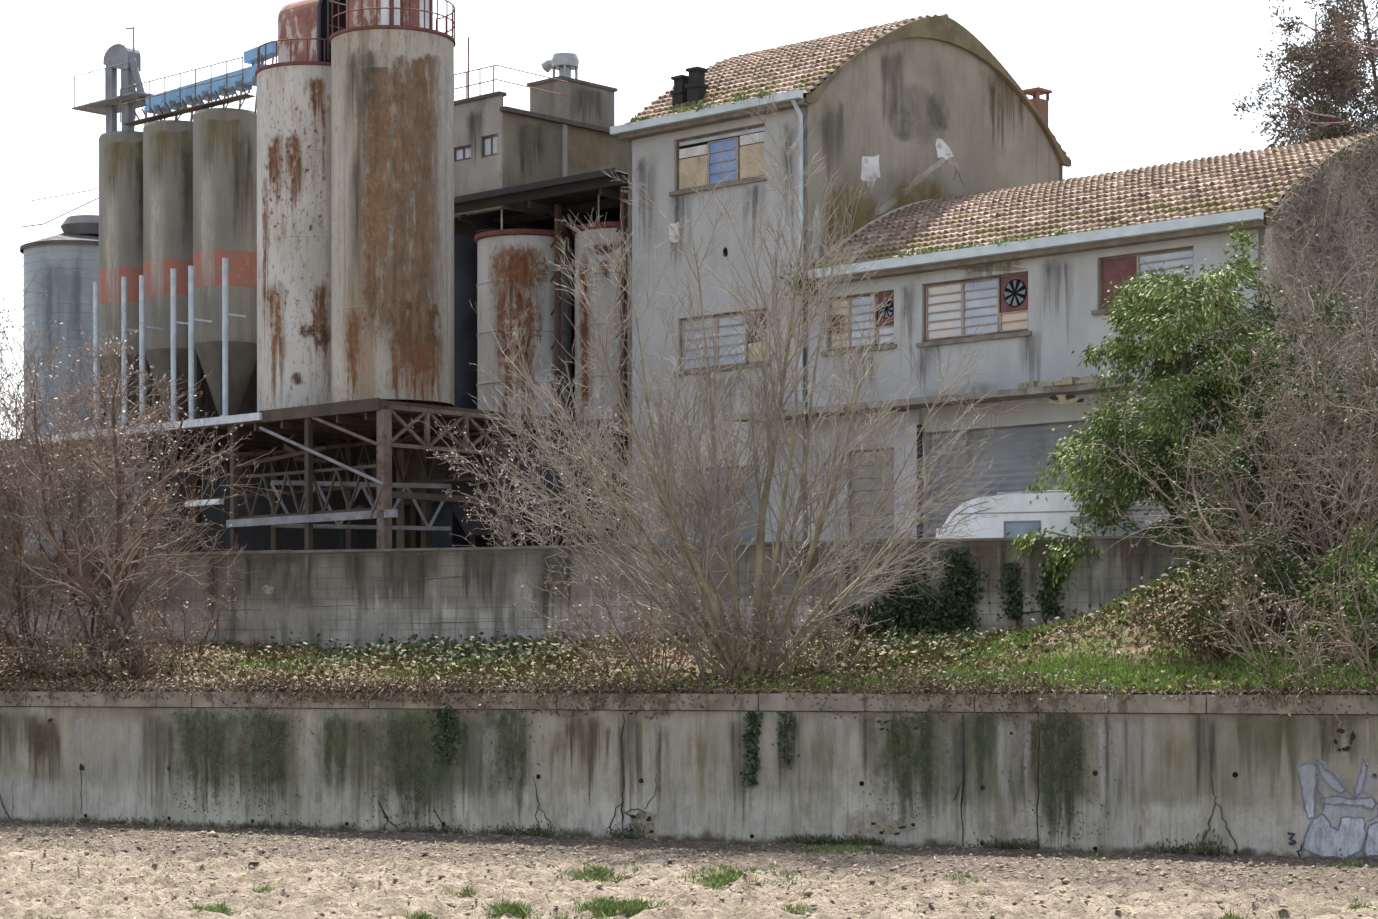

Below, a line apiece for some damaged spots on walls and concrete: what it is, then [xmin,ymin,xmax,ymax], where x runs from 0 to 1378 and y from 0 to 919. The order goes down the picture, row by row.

rust [262,79,330,389]
rust [347,54,439,401]
rust [492,247,548,414]
crack [609,715,658,837]
crack [1201,738,1238,855]